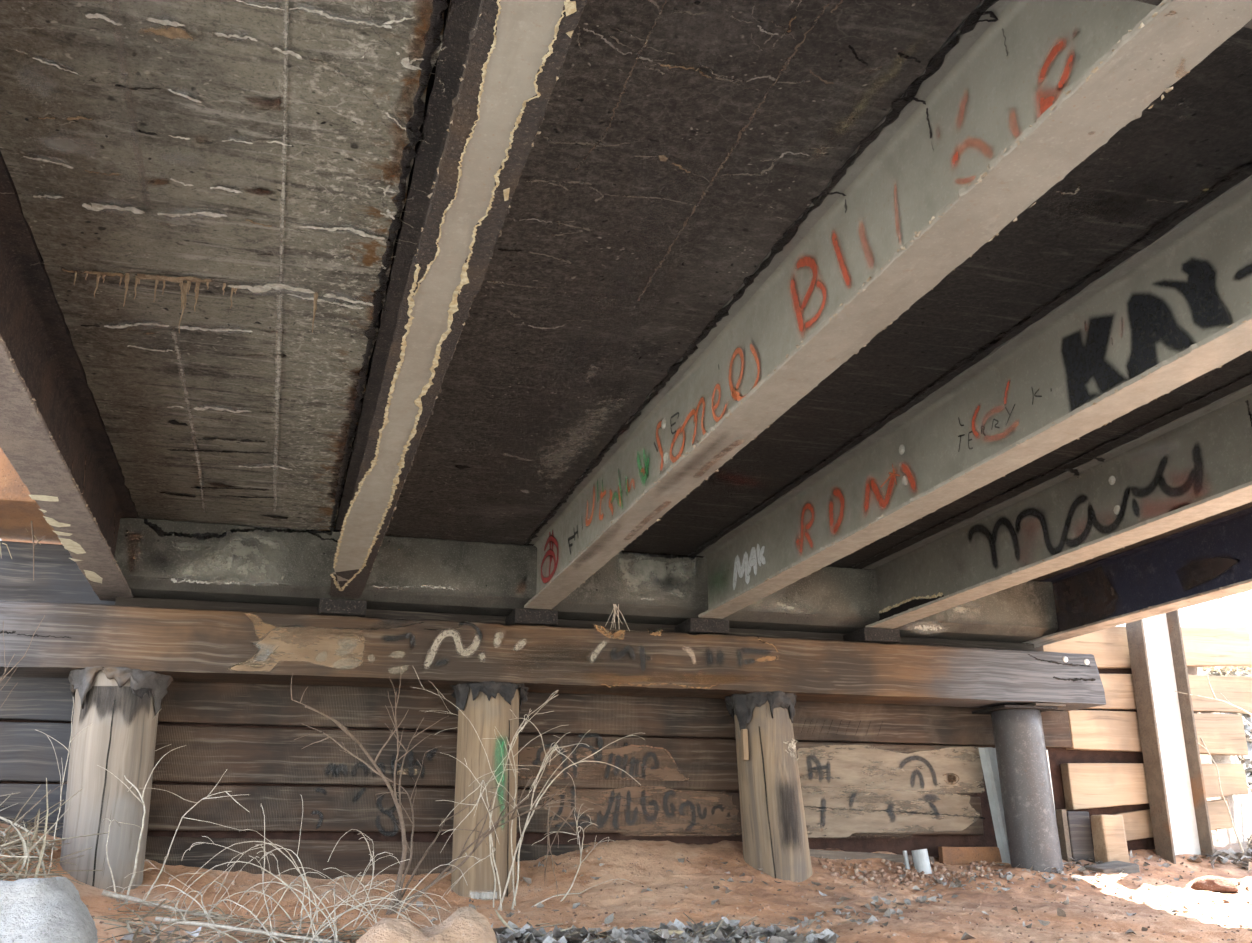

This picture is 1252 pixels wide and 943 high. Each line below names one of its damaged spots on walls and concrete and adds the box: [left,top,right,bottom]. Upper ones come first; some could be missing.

crack [1,0,413,147]
leakage [357,0,446,92]
crack [649,0,706,15]
crack [577,27,921,91]
crack [0,151,416,244]
peeling [144,0,588,596]
leakage [354,166,428,228]
crack [488,137,834,329]
leakage [168,332,206,512]
leakage [273,295,283,511]
corrosion [328,371,360,498]
crack [92,710,114,887]